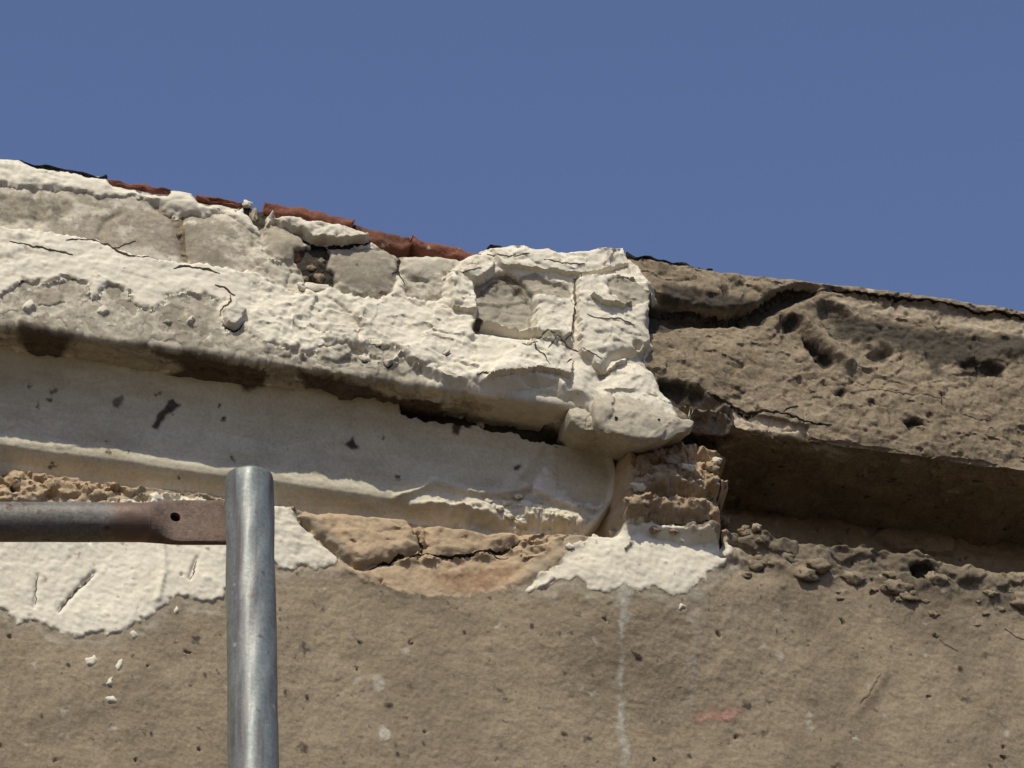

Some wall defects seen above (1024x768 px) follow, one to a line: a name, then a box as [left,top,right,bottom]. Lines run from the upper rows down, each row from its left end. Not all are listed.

crack [9,238,235,311]
spalling [294,247,333,292]
crack [448,253,1024,364]
crack [709,394,833,428]
crack [369,534,521,570]
spalling [721,516,1024,626]